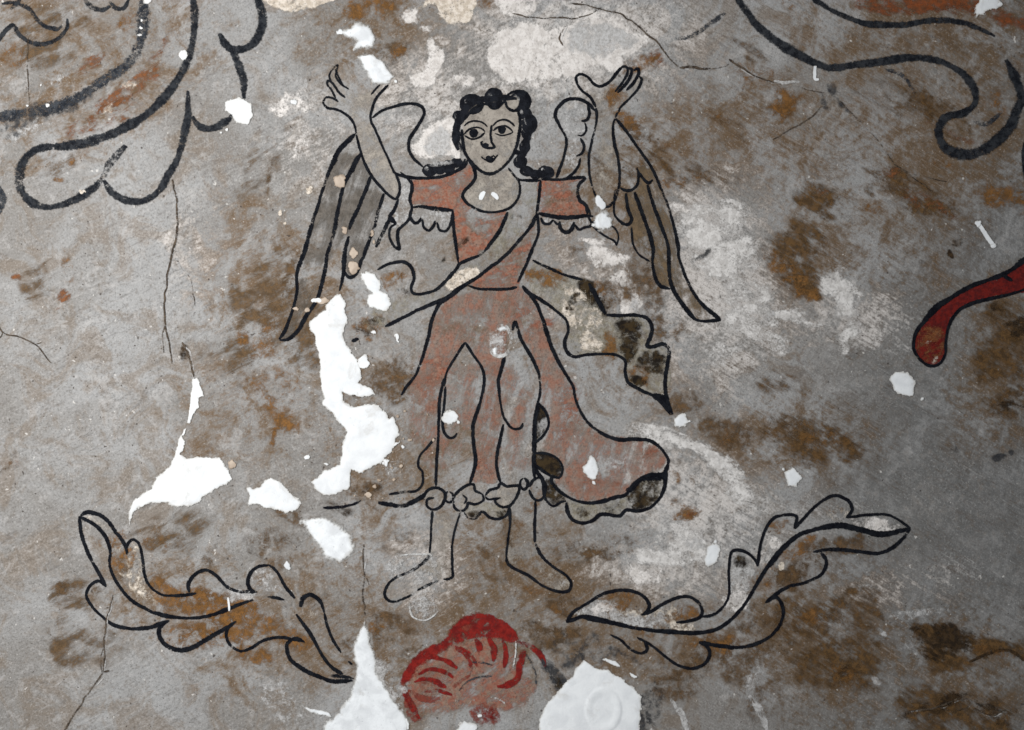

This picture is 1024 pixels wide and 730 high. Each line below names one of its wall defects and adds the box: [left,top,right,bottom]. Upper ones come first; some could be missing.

flaking render [220,97,253,134]
flaking render [333,174,346,188]
crack [162,179,195,378]
flaking render [348,247,391,311]
flaking render [292,294,415,499]
flaking render [889,371,924,401]
flaking render [128,378,236,525]
flaking render [247,478,354,562]
flaking render [262,622,409,730]
flaking render [539,658,642,730]